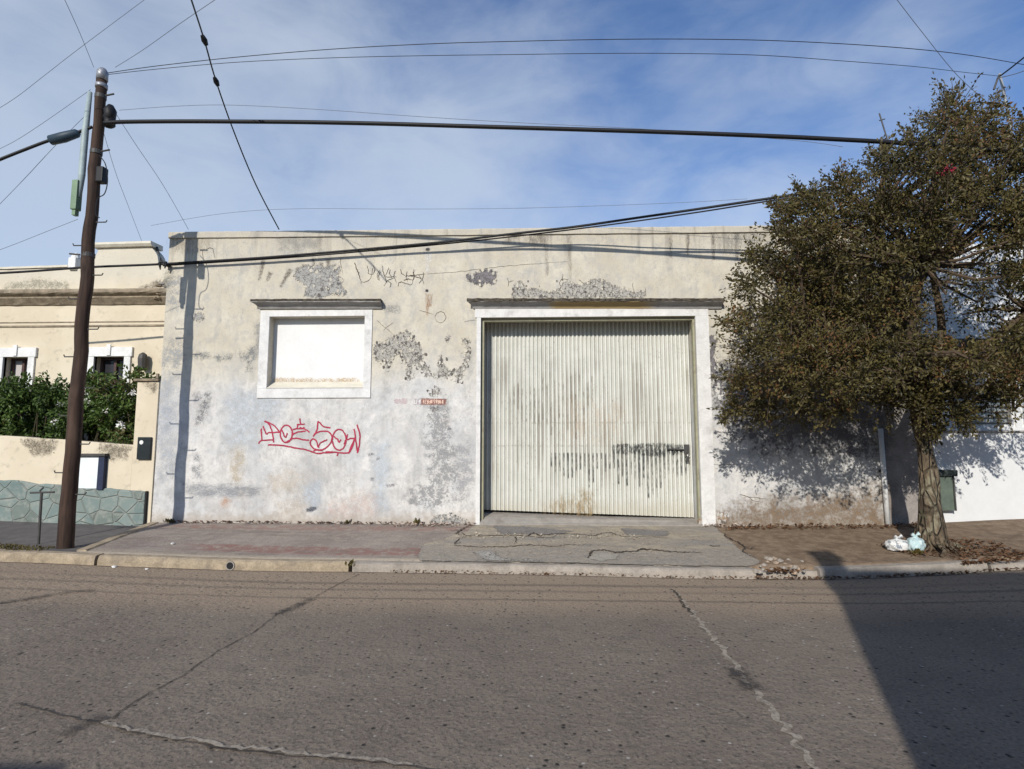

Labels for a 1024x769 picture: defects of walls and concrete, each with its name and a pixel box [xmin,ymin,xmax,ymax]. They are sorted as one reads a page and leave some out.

peeling [293,263,347,298]
flaking render [466,268,497,287]
peeling [511,277,646,298]
peeling [372,330,471,397]
damp [410,403,472,507]
crack [451,526,756,558]
crack [670,589,694,615]
crack [18,614,435,769]